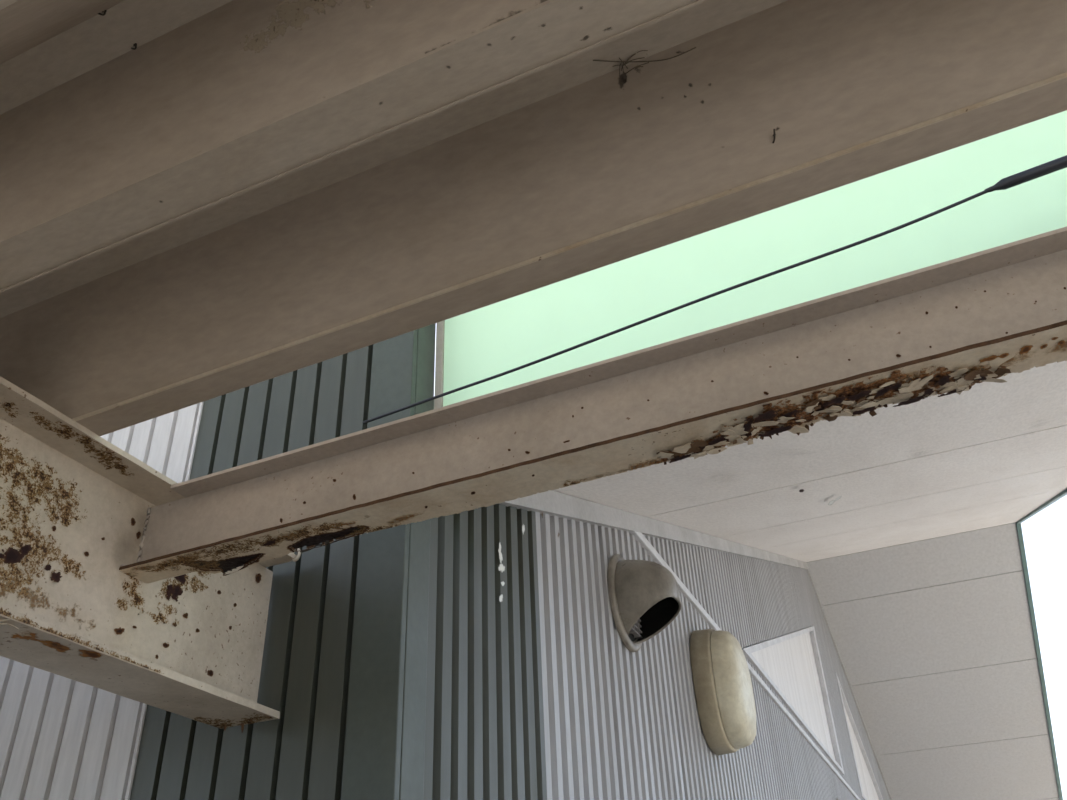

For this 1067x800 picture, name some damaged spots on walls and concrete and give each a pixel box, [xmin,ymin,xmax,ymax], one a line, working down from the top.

corrosion [0,401,134,476]
corrosion [623,337,1067,471]
corrosion [0,434,169,674]
corrosion [114,504,415,635]